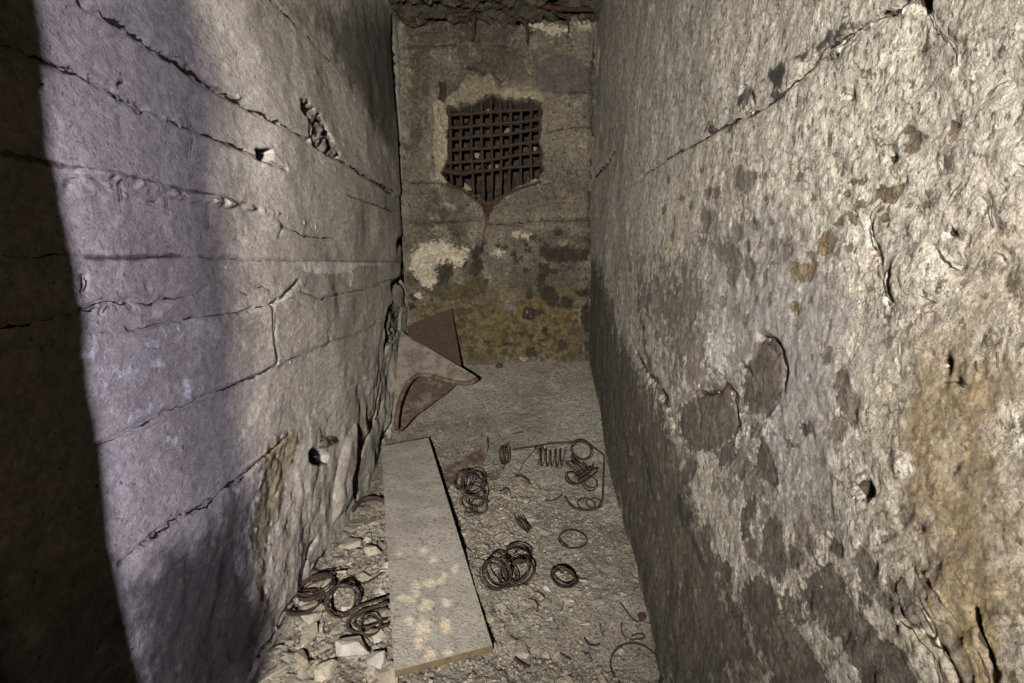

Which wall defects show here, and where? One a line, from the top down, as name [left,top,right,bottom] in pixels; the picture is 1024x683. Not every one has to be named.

spalling [300,99,341,158]
spalling [433,72,544,183]
crack [644,0,969,176]
peeling [903,122,923,154]
crack [0,2,616,446]
rust [446,180,541,240]
crack [870,200,938,306]
crack [120,437,285,562]
water stain [406,229,776,683]
water stain [694,206,858,518]
peeling [622,136,930,683]